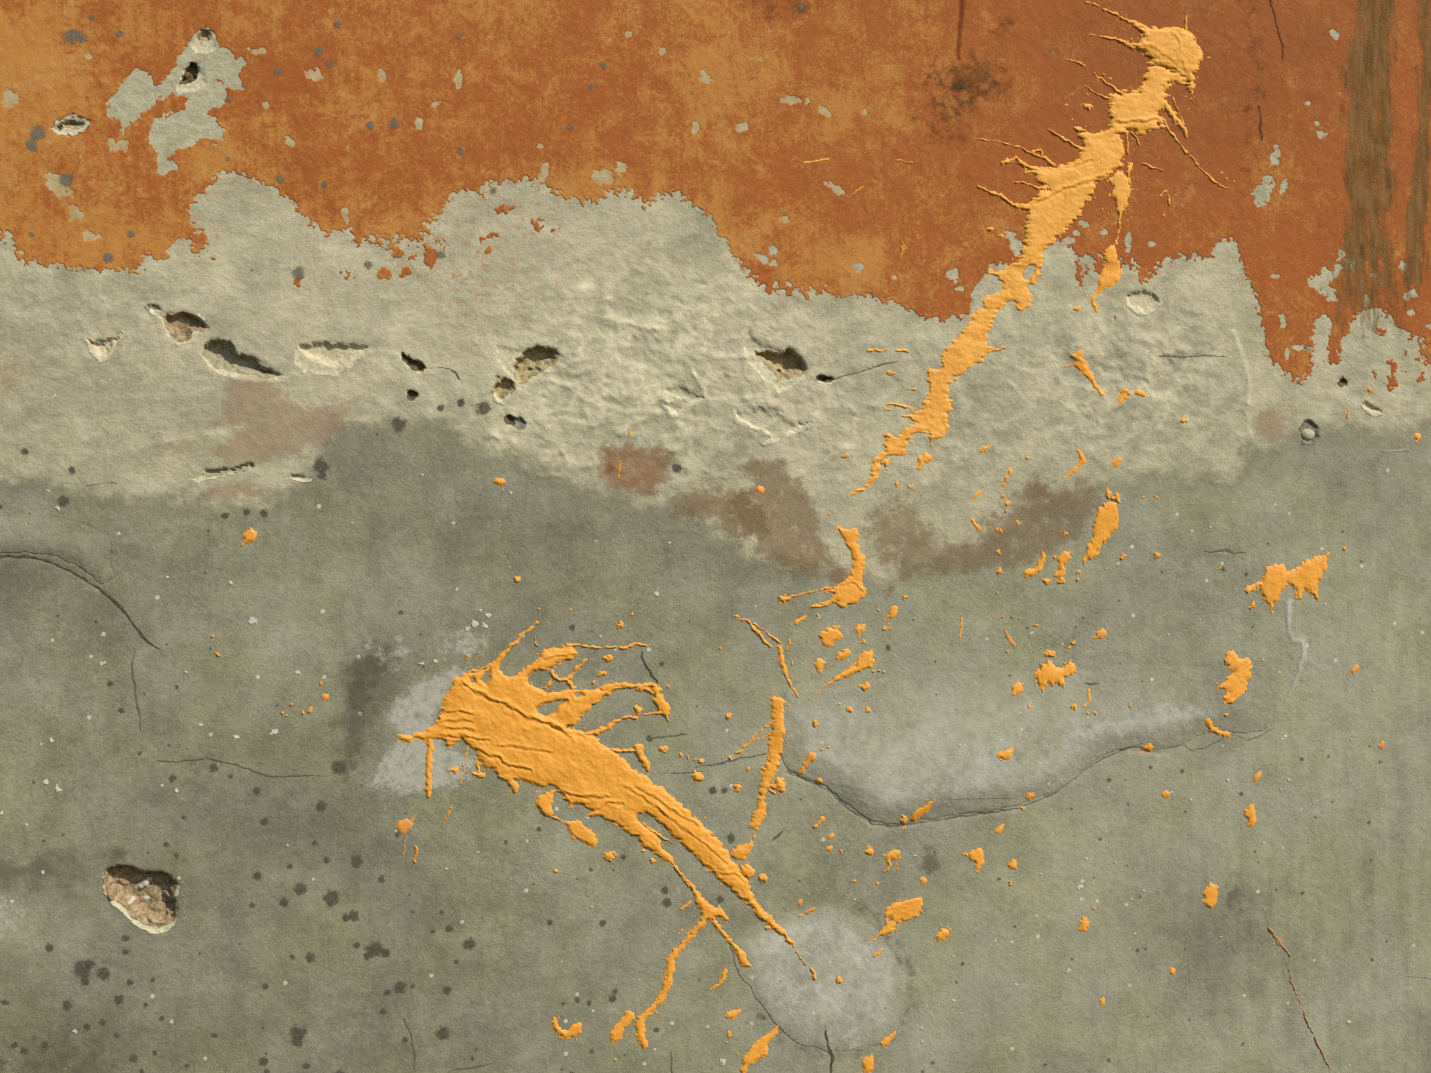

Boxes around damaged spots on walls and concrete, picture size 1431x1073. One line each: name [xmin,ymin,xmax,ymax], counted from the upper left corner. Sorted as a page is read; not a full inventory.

peeling [0,143,1431,584]
crack [0,555,322,777]
spalling [102,865,180,934]